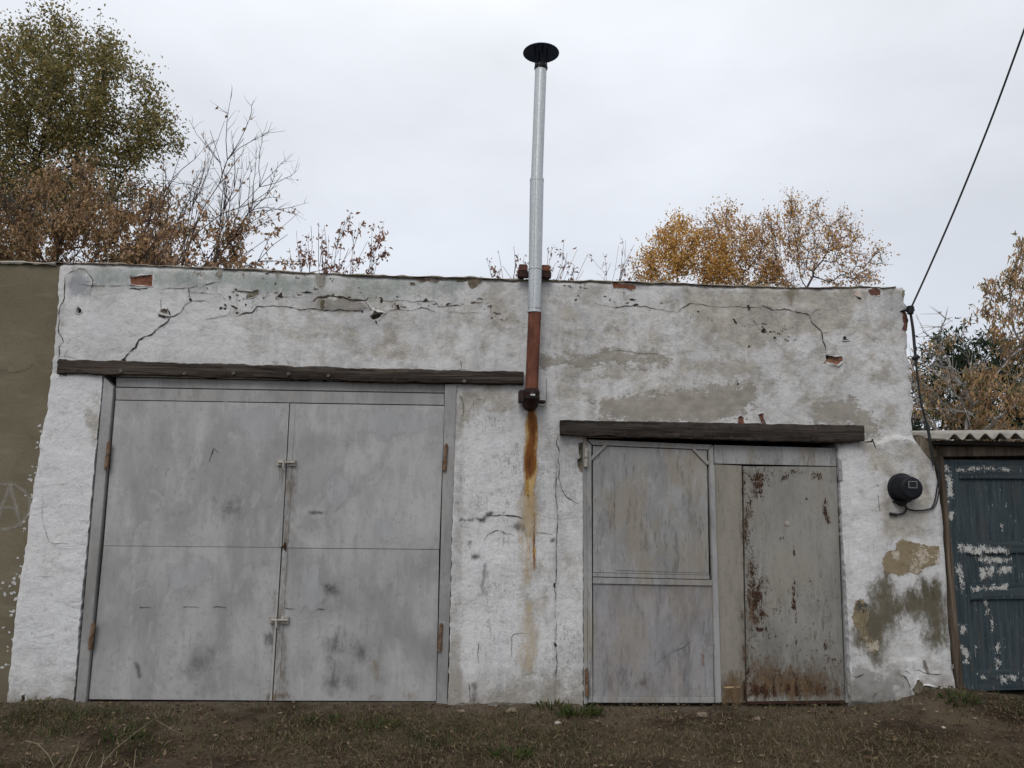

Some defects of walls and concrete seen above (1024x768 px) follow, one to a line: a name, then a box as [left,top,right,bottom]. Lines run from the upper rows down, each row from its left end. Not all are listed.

crack [58,268,125,360]
flaking render [127,274,156,290]
crack [120,282,505,361]
crack [596,298,831,349]
flaking render [822,354,845,368]
corrosion [522,410,538,576]
peeling [944,464,1011,521]
crack [486,433,579,672]
corrosion [721,463,845,705]
peeling [852,599,881,655]
peeling [882,539,941,577]
peeling [951,544,1020,685]